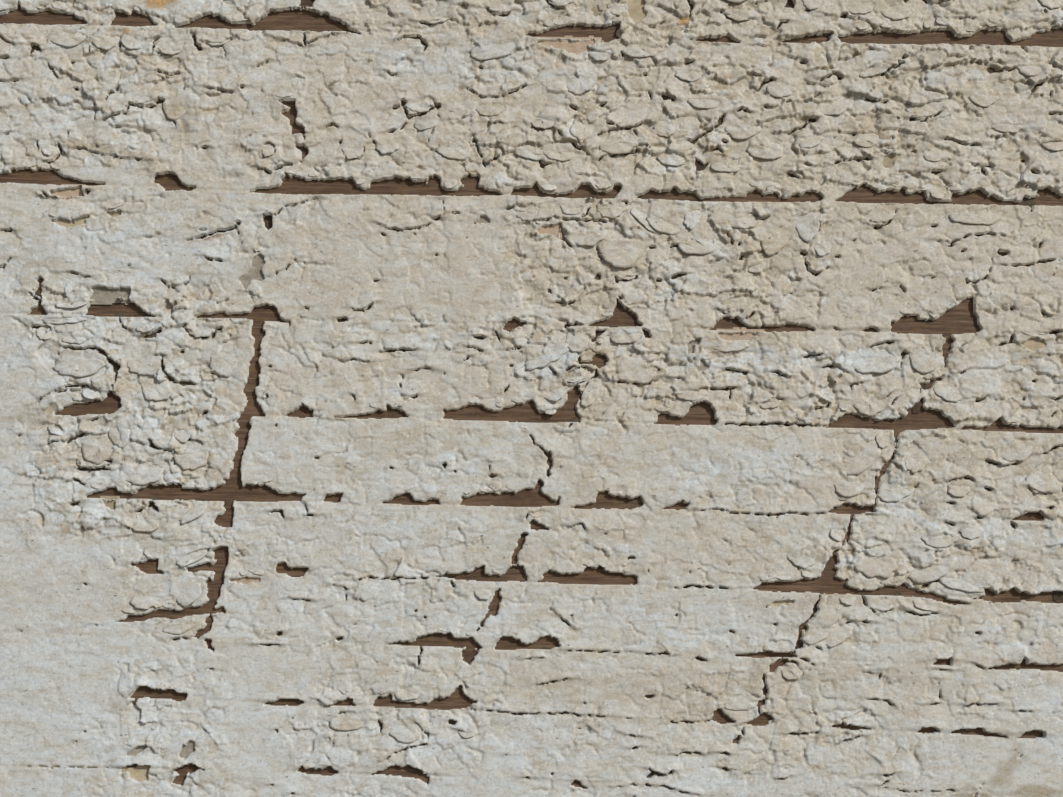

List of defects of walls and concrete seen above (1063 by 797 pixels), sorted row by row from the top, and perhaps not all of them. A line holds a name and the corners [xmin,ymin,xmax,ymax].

peeling [780,0,1063,78]
peeling [28,273,313,532]
peeling [443,297,651,428]
crack [912,339,953,414]
peeling [460,466,560,519]
crack [701,509,818,518]
crack [842,518,853,545]
crack [874,433,898,499]
peeling [815,382,1063,529]
peeling [436,556,637,600]
peeling [735,517,1063,680]
crack [732,601,818,743]